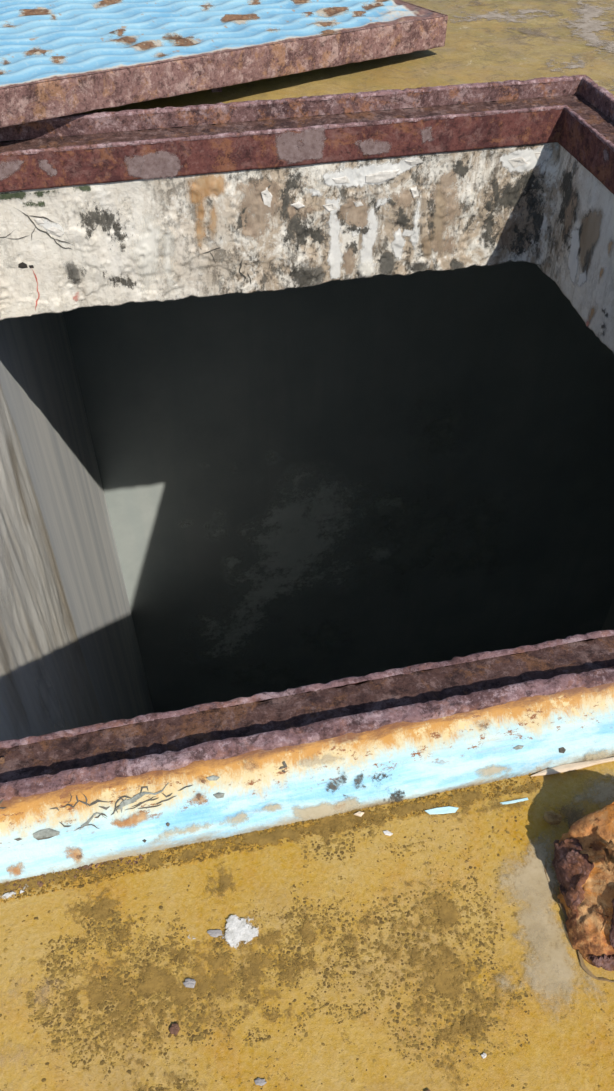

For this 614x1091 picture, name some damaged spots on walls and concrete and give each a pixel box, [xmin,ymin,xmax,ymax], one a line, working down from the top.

rust [4,7,56,27]
rust [220,0,260,24]
rust [293,0,388,36]
rust [110,29,199,57]
damp [73,185,174,290]
damp [278,159,474,287]
damp [481,172,545,256]
damp [557,169,602,286]
peeling [14,828,60,841]
crack [52,783,192,830]
rust [112,812,147,828]
peeling [425,806,458,814]